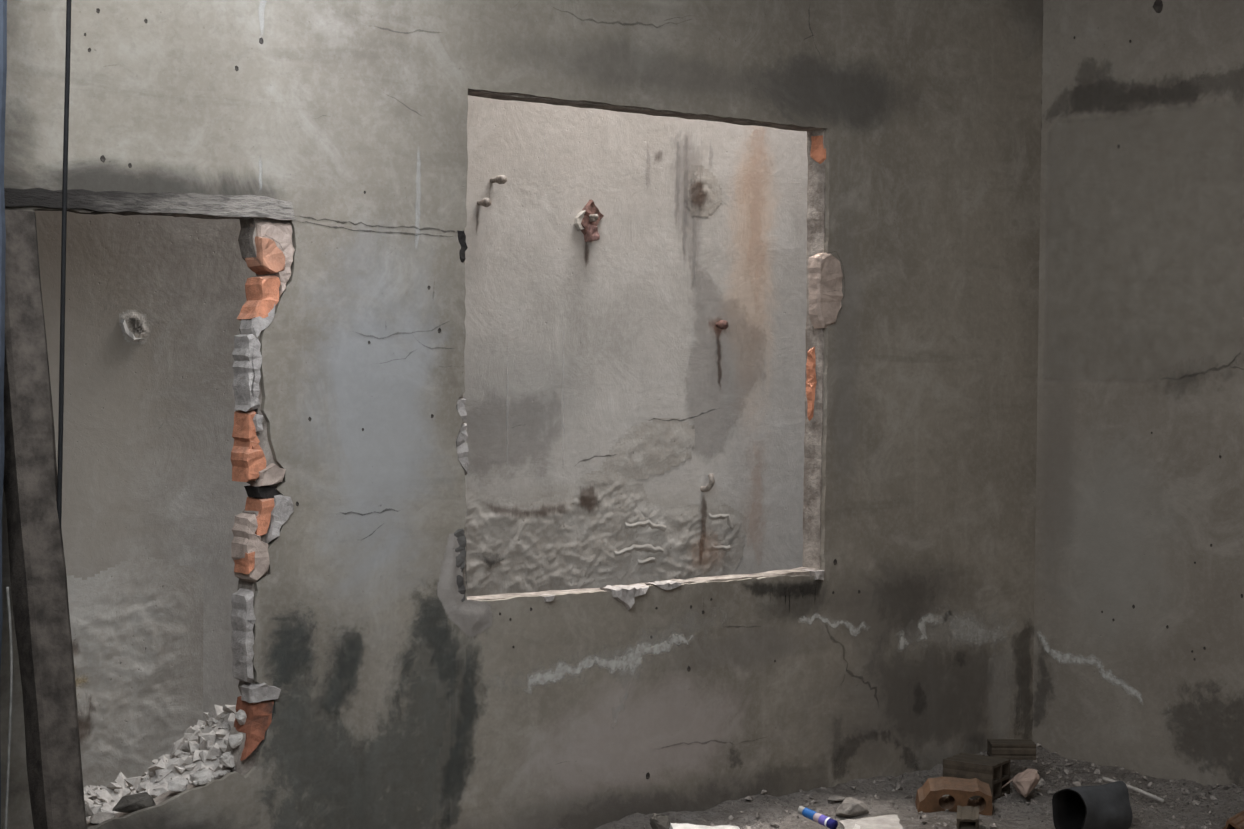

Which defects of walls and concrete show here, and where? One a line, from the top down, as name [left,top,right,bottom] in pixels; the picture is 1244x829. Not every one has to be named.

peeling [250,222,295,297]
hole [119,310,150,344]
peeling [232,334,263,432]
peeling [231,463,299,703]
spalling [67,555,204,788]
efflorescence [529,635,693,690]
leakage [800,613,865,636]
efflorescence [899,615,1002,649]
leakage [1040,634,1142,702]